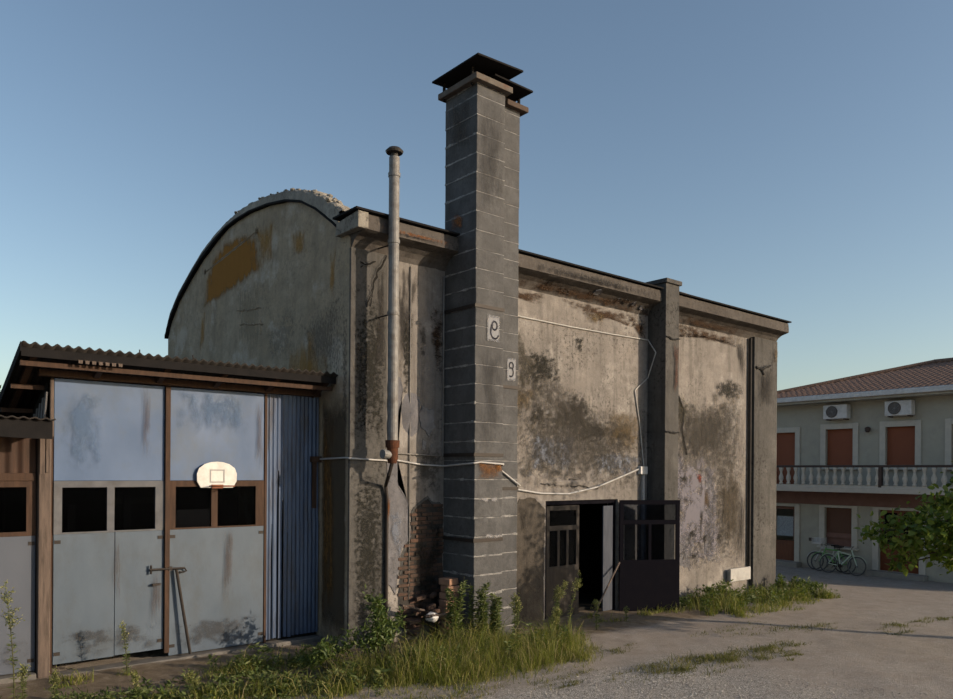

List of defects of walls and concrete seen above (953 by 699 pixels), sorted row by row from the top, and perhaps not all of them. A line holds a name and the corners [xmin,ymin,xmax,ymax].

water stain [307,275,386,631]
spalling [387,461,444,629]
water stain [399,271,443,392]
water stain [517,335,637,480]
water stain [678,380,745,561]